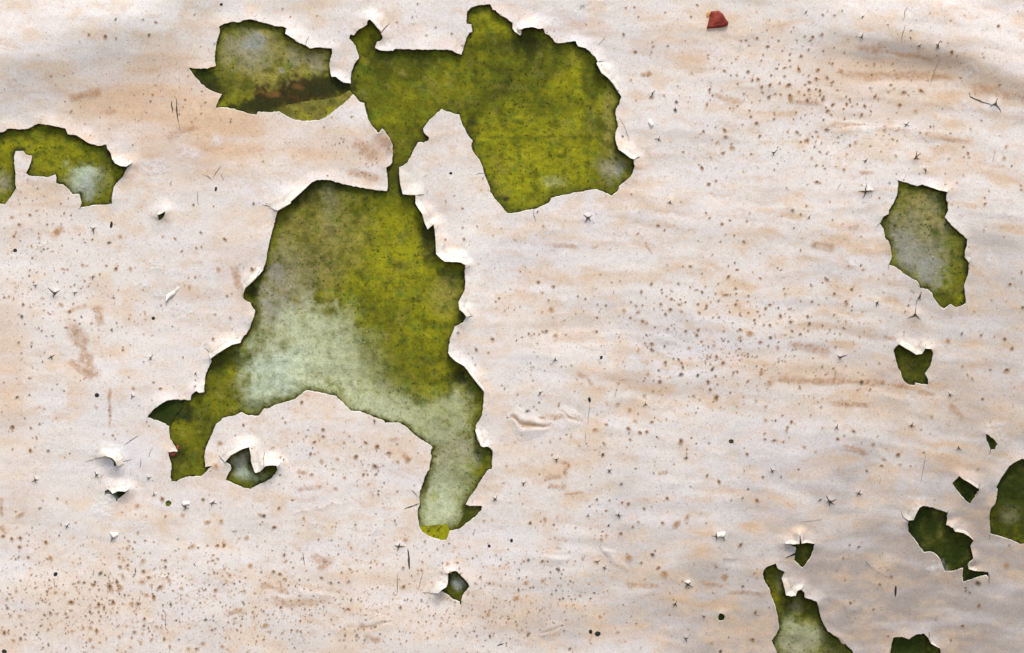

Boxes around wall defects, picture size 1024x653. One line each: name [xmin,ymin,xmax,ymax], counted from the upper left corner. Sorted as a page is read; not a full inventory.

peeling [0,123,132,208]
peeling [147,4,638,541]
peeling [879,180,972,309]
peeling [893,339,933,386]
peeling [903,506,989,582]
peeling [952,476,979,504]
peeling [989,459,1024,544]
peeling [429,571,470,606]
peeling [763,533,853,653]
peeling [890,633,941,653]